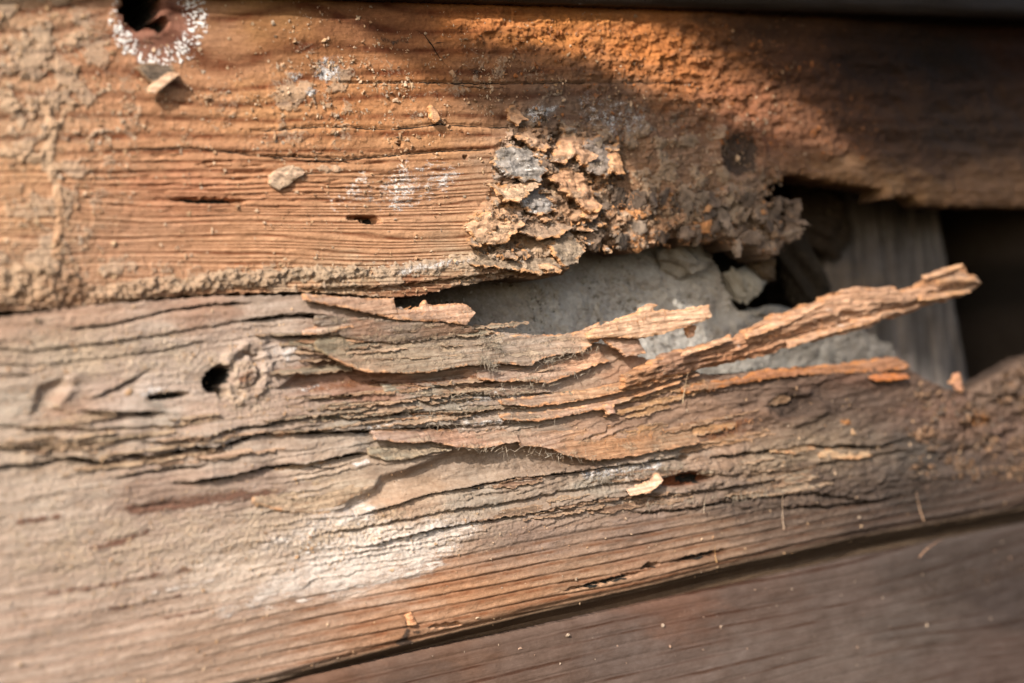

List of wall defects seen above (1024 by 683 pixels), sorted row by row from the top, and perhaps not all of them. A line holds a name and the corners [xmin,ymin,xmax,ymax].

spalling [464,105,811,276]
crack [67,302,316,338]
crack [0,369,459,512]
crack [814,439,907,449]
crack [355,458,676,517]
crack [622,450,906,514]